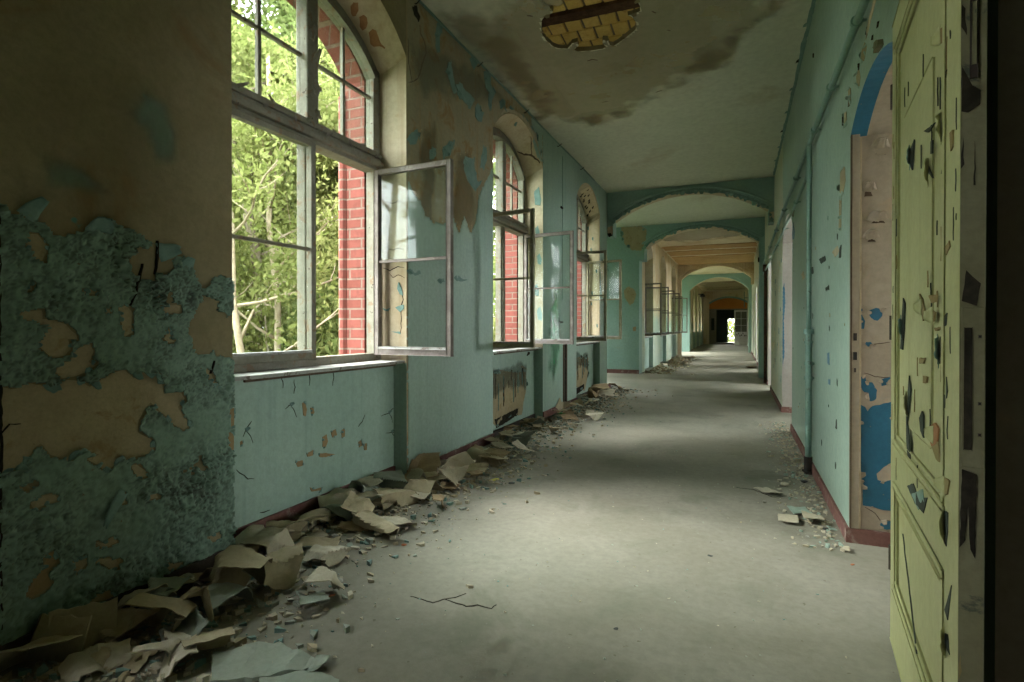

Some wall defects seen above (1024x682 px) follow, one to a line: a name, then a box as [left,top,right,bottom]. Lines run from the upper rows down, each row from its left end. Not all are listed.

peeling [842,0,884,128]
peeling [0,196,244,646]
crack [129,241,159,306]
peeling [295,428,345,467]
peeling [383,168,528,470]
flaking render [576,358,589,395]
peeling [801,166,846,280]
peeling [861,305,887,348]
peeling [861,375,933,532]
crack [410,593,496,609]